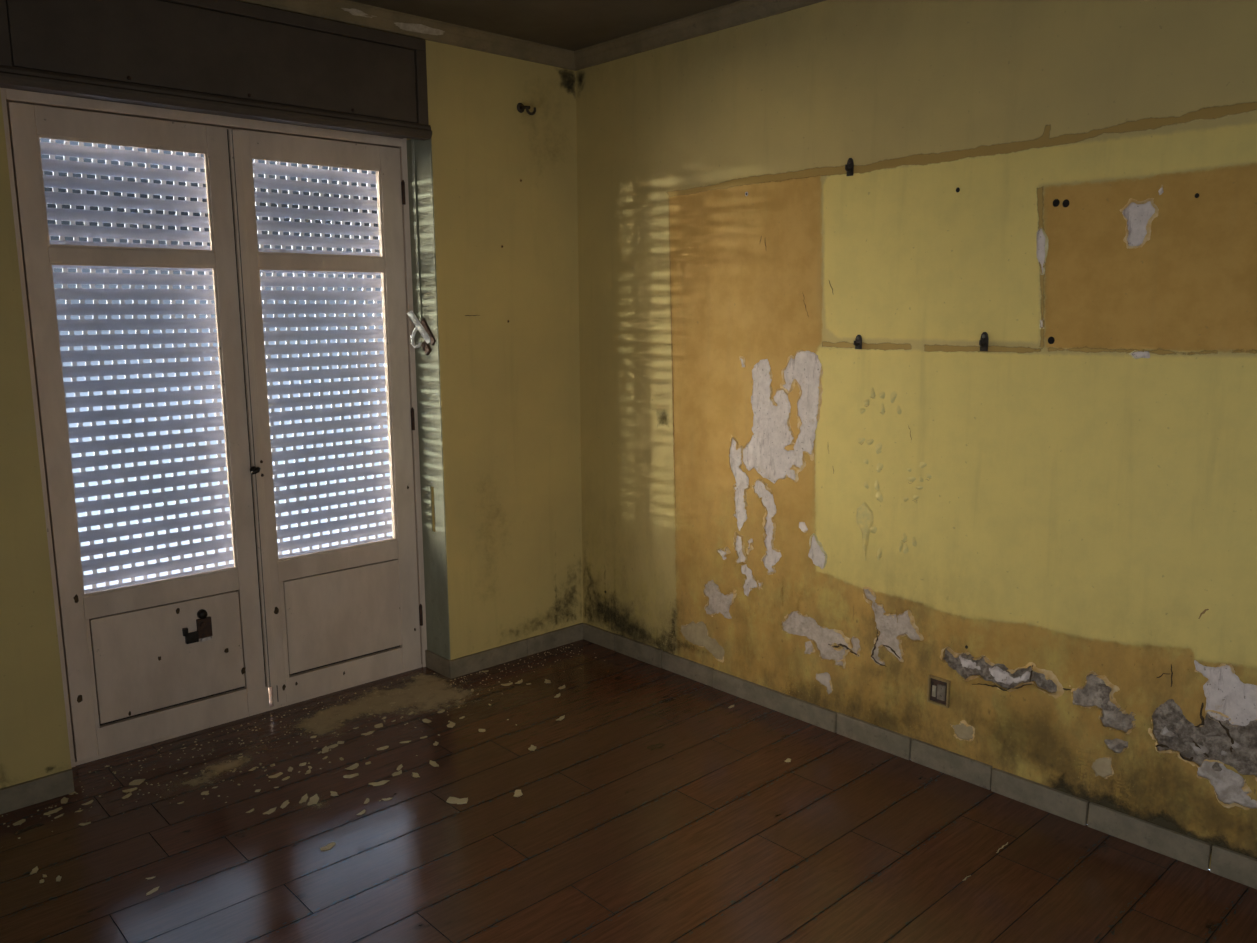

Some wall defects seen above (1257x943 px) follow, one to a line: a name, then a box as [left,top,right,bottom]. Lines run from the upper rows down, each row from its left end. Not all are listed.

peeling [1120,185,1164,249]
peeling [680,350,827,662]
leakage [588,592,676,652]
peeling [781,587,924,694]
flaking render [940,646,1257,810]
leakage [1052,768,1257,859]